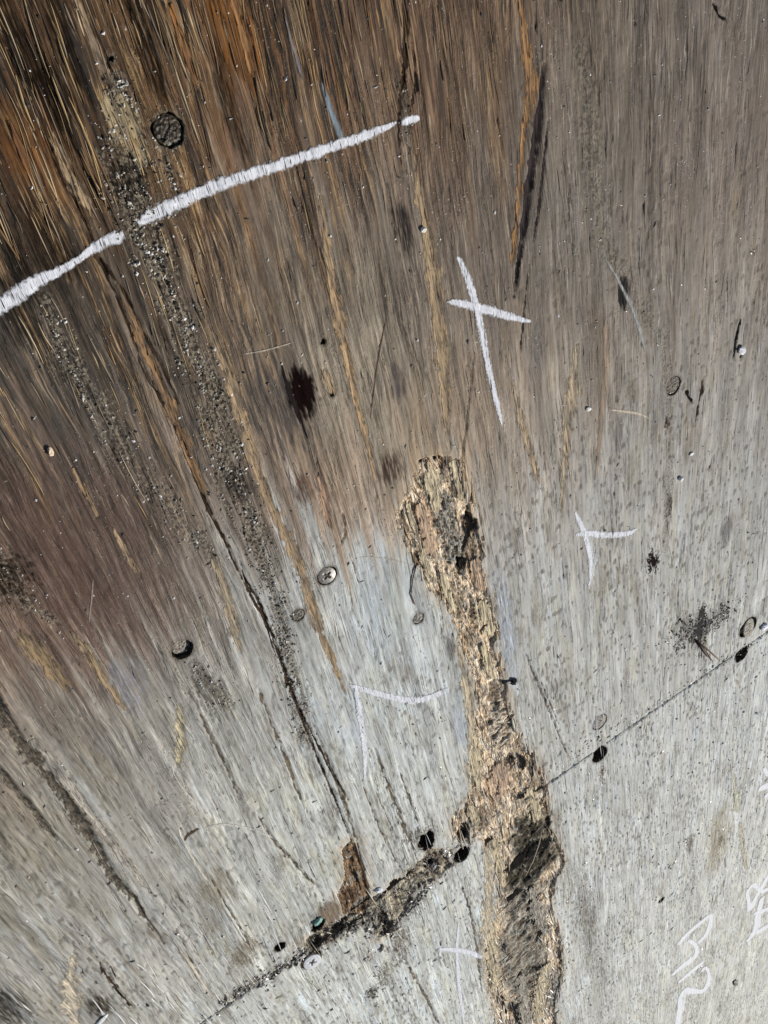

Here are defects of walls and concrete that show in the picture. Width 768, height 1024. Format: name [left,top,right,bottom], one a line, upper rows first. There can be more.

crack [514,66,548,346]
water stain [281,362,308,439]
spalling [304,148,565,1024]